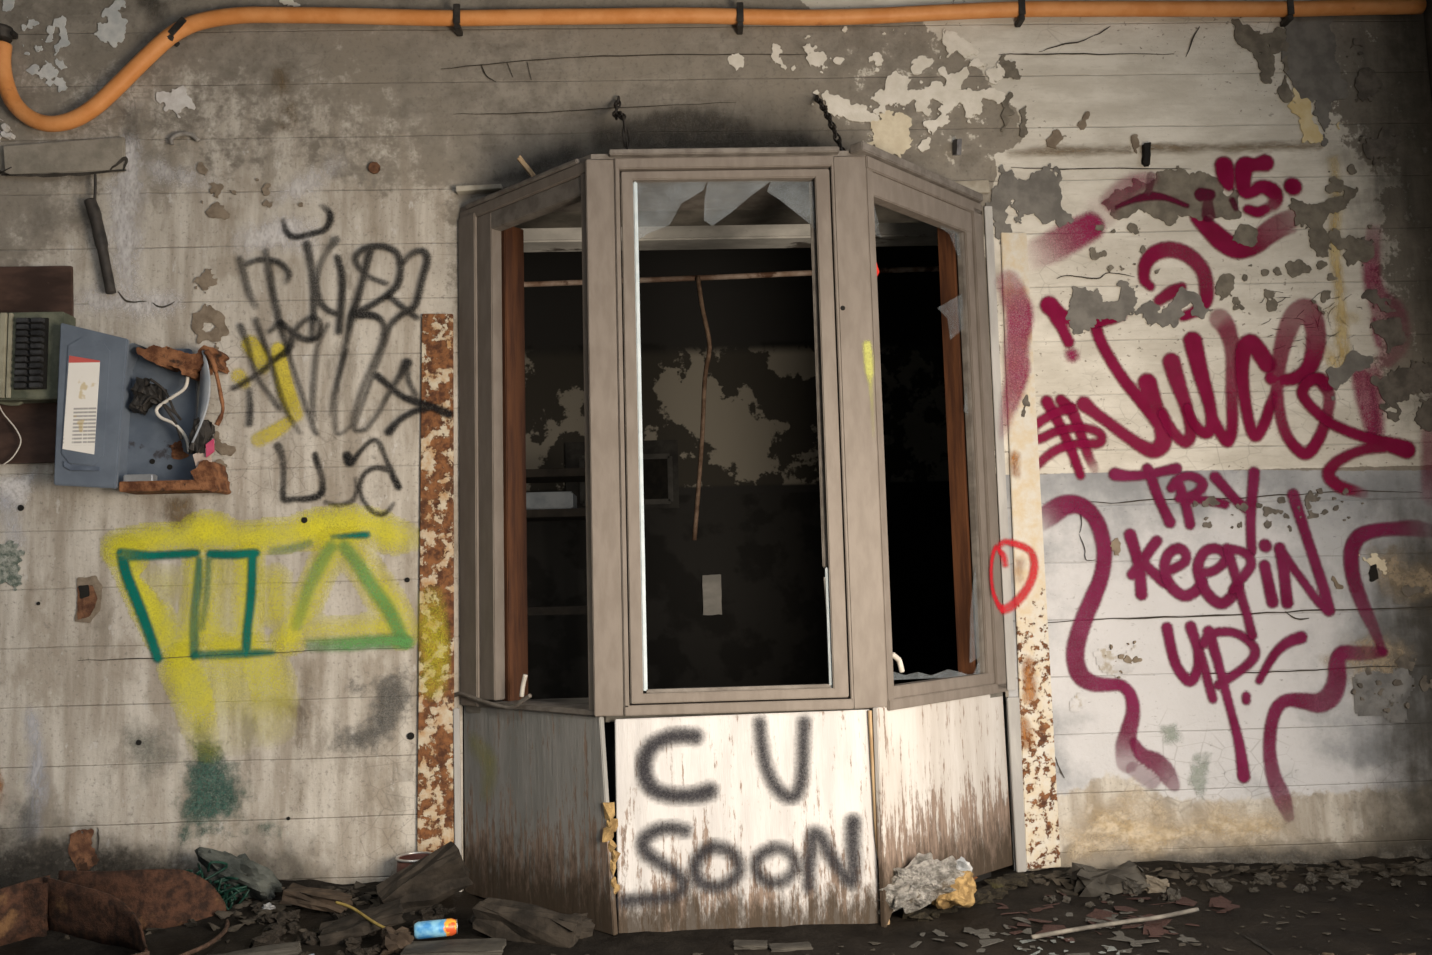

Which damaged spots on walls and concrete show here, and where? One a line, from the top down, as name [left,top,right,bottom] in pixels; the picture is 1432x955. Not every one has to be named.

peeling [2,0,70,92]
peeling [94,0,128,48]
peeling [771,29,1028,158]
peeling [1231,16,1383,147]
peeling [986,129,1074,245]
peeling [1065,126,1402,335]
peeling [1326,289,1432,432]
corrosion [1021,720,1030,747]
corrosion [1024,659,1035,701]
spalling [1351,654,1432,723]
water stain [181,745,245,839]
water stain [0,809,180,889]